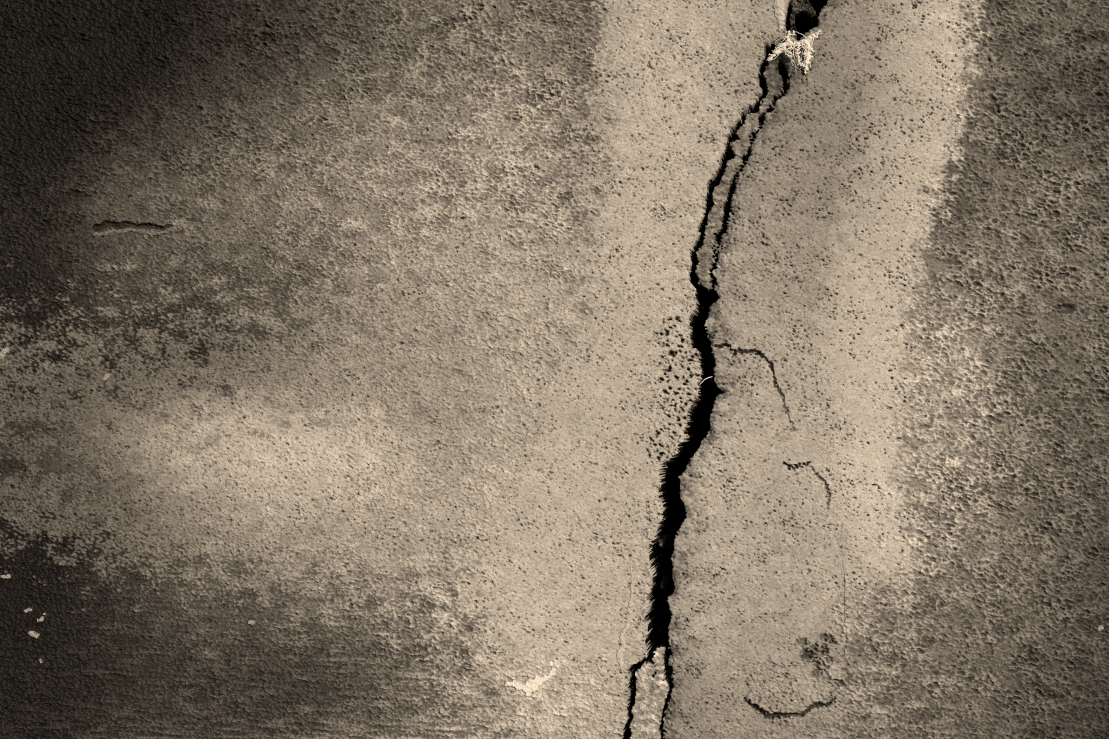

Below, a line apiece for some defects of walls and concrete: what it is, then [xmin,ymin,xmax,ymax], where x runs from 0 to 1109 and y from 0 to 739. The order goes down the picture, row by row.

crack [623,0,831,739]